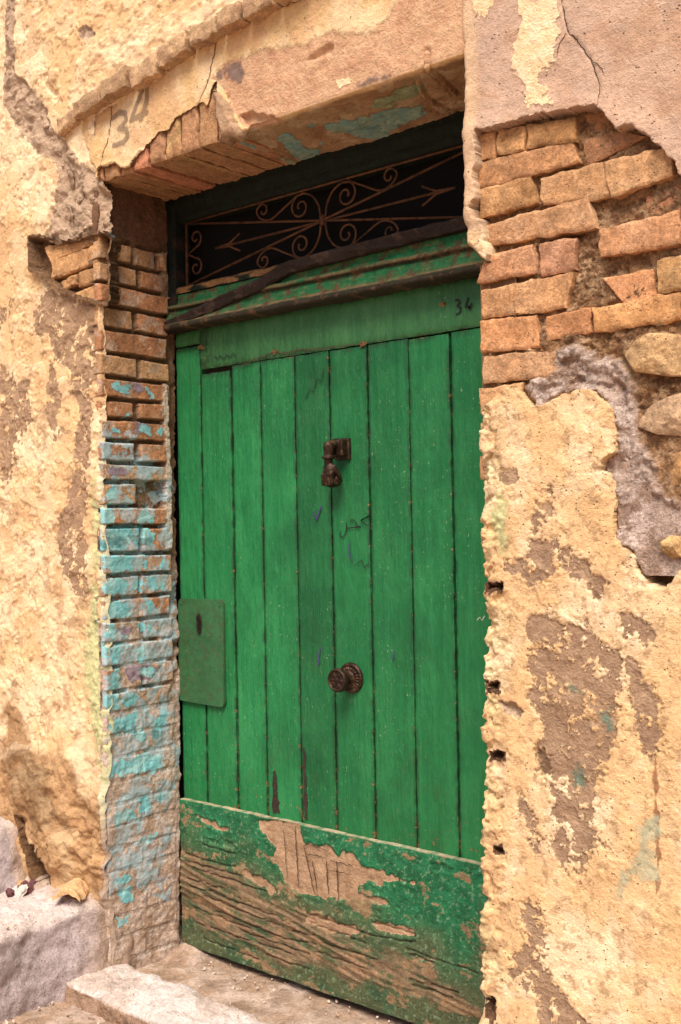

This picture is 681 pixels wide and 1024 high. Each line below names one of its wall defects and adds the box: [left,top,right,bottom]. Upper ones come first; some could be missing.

crack [557,0,604,105]
peeling [0,0,494,928]
peeling [484,485,610,600]
flaking render [477,110,681,576]
peeling [484,612,664,884]